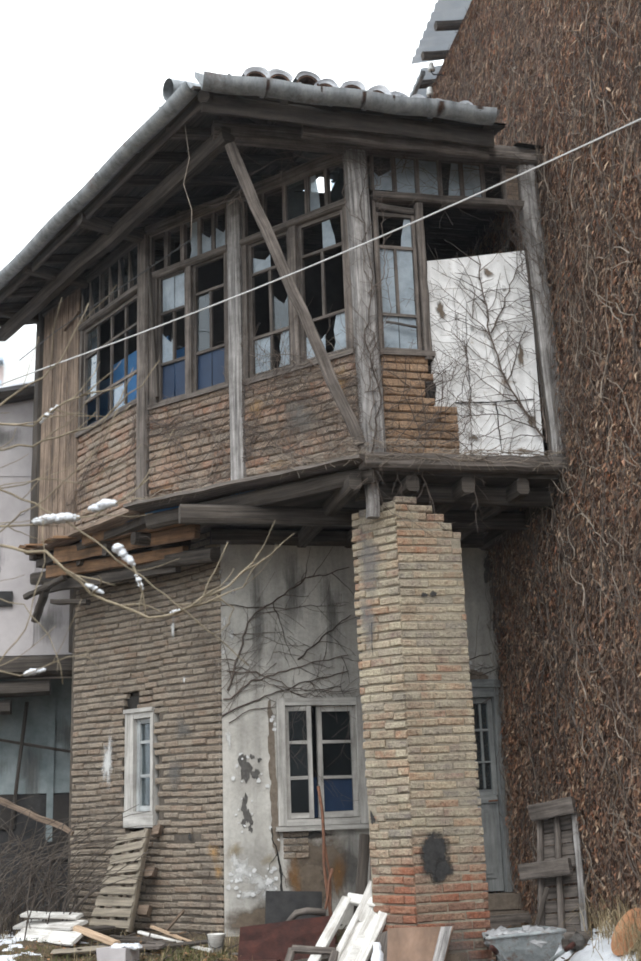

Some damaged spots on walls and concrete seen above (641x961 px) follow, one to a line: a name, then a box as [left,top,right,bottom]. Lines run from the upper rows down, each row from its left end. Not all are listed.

spalling [231,700,332,859]
peeling [226,852,278,930]